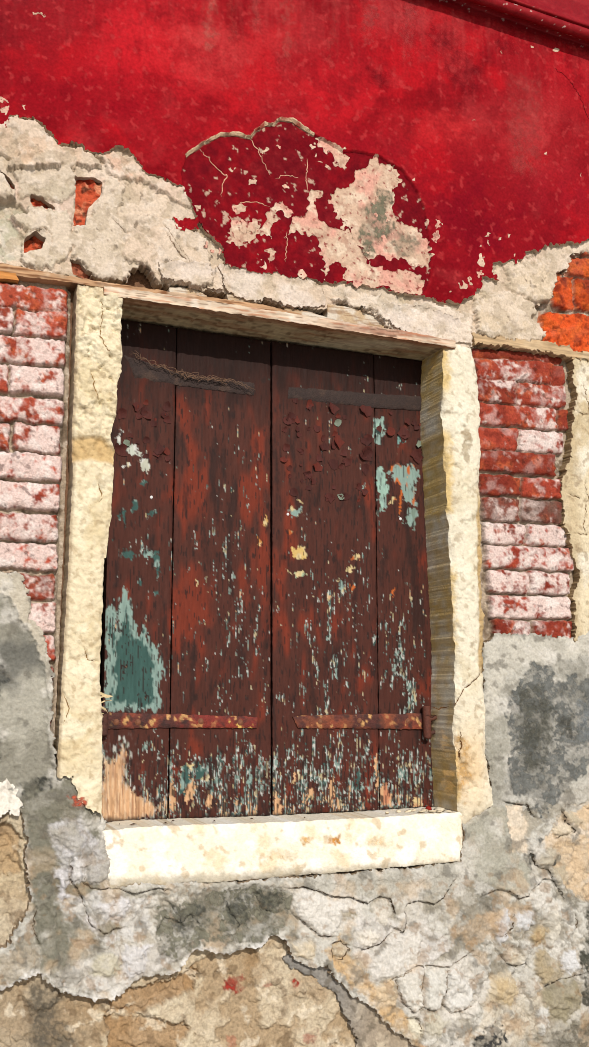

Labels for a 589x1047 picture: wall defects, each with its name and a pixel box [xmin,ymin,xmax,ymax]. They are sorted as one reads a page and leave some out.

spalling [24,236,44,253]
spalling [71,262,94,281]
spalling [73,179,102,226]
crack [250,138,308,189]
spalling [158,117,589,640]
spalling [0,281,71,747]
water stain [505,662,589,818]
spalling [0,812,31,945]
crack [256,884,452,960]
crack [490,853,578,967]
spalling [0,935,356,1047]
crack [390,955,471,1032]